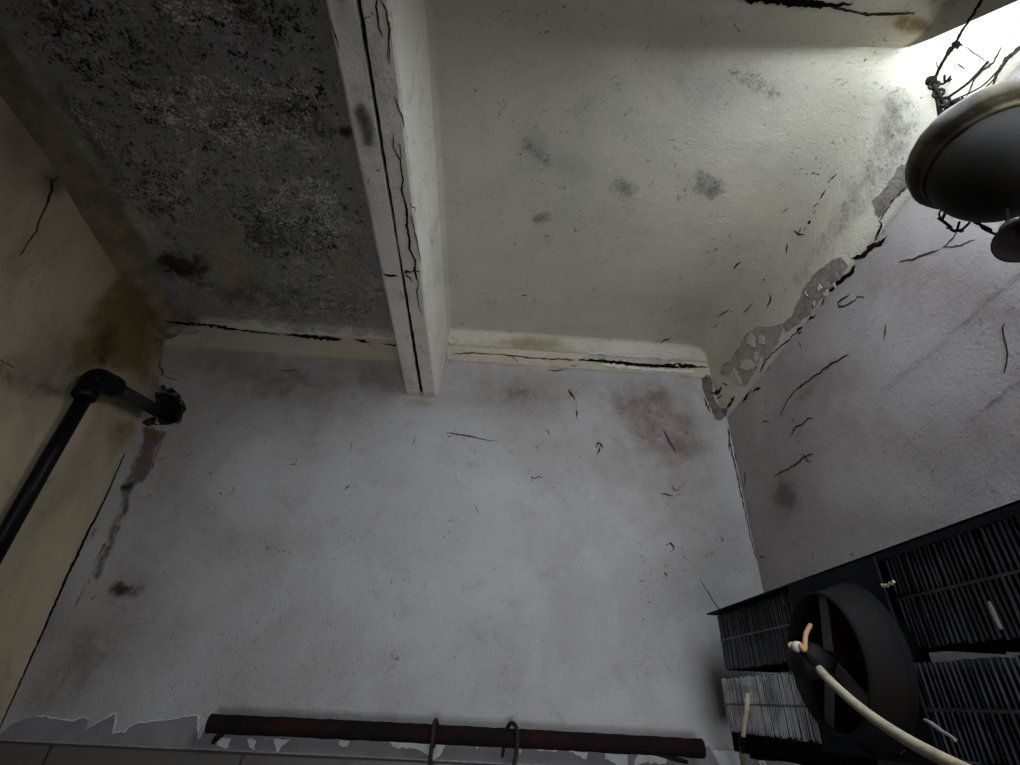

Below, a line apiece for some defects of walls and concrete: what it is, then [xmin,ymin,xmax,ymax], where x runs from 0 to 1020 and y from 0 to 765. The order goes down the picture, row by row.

crack [740,0,915,17]
crack [935,0,1020,97]
damp [0,0,393,334]
crack [165,0,423,391]
peeling [872,164,907,218]
crack [455,338,707,372]
peeling [580,257,849,420]
crack [743,187,907,402]
crack [900,232,973,262]
crack [762,354,849,477]
peeling [0,712,719,765]
peeling [738,752,795,765]